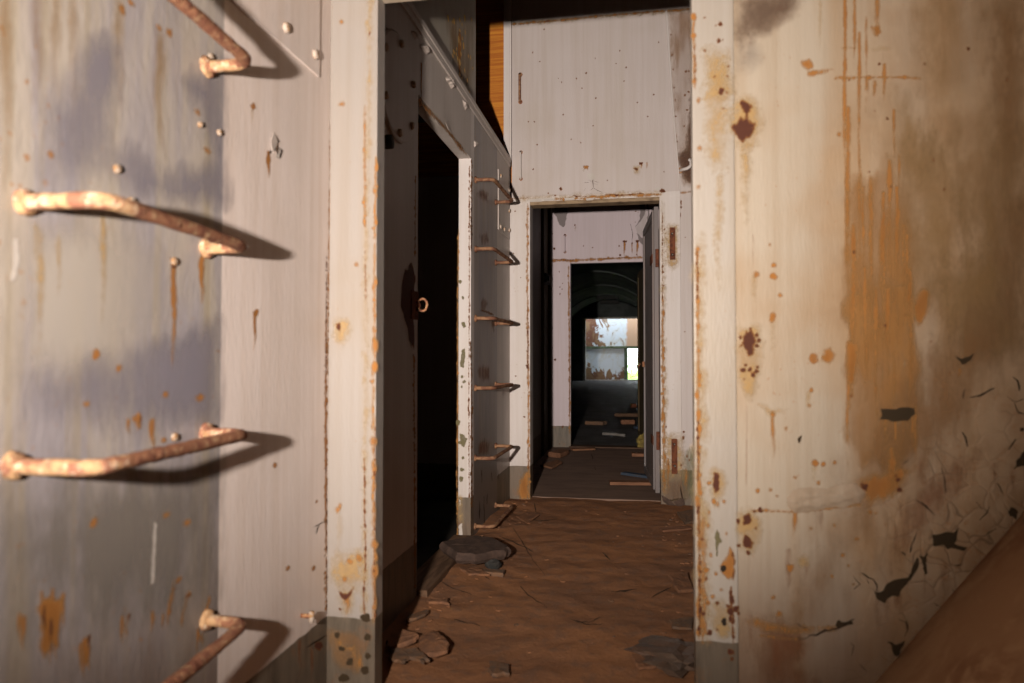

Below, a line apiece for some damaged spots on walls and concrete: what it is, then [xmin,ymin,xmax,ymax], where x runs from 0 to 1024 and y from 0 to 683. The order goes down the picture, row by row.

rust [513,9,730,127]
rust [698,99,758,177]
rust [809,0,991,514]
rust [312,123,378,619]
rust [661,186,762,661]
spalling [879,407,915,440]
crack [963,377,1024,414]
crack [902,467,946,555]
spalling [862,529,967,603]
rust [37,589,65,657]